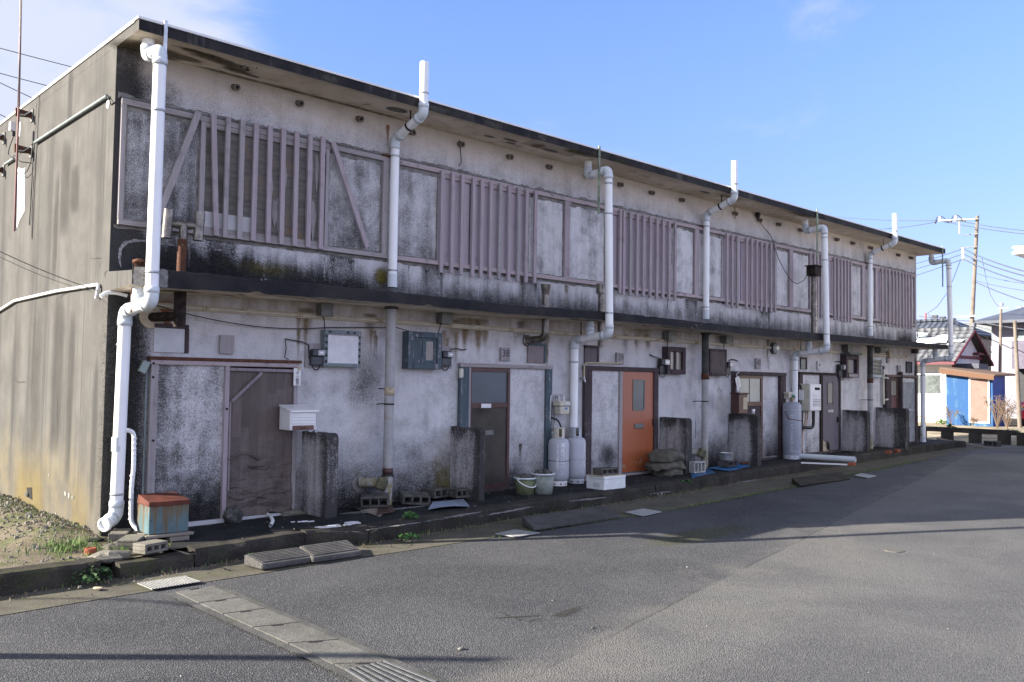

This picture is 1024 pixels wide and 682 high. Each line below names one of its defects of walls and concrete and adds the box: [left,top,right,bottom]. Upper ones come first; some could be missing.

damp [112,42,142,52]
damp [167,48,392,117]
damp [159,240,380,291]